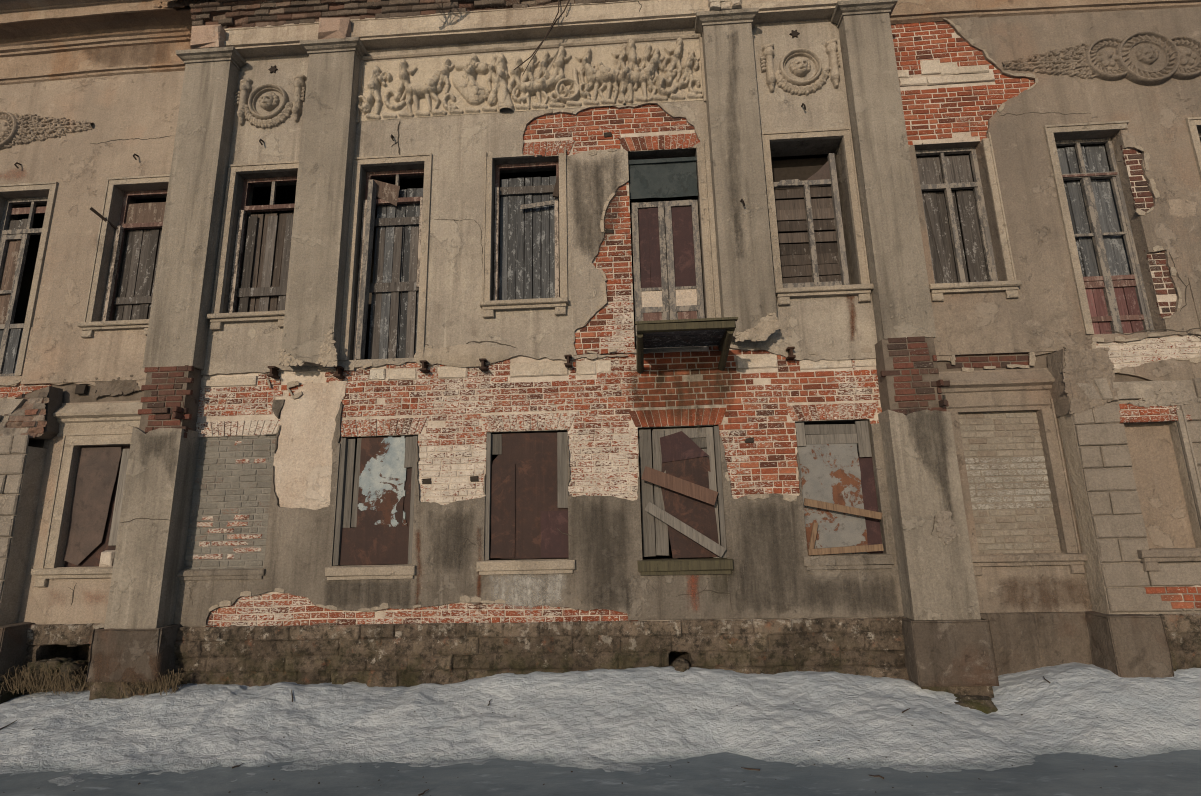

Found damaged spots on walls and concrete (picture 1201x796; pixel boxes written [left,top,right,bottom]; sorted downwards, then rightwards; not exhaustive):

flaking render [891,18,1039,148]
flaking render [520,101,701,158]
flaking render [1120,145,1160,216]
flaking render [75,182,1036,527]
flaking render [1062,245,1201,423]
flaking render [0,378,54,438]
flaking render [205,588,638,627]
water stain [495,574,562,607]
flaking render [1144,585,1201,611]